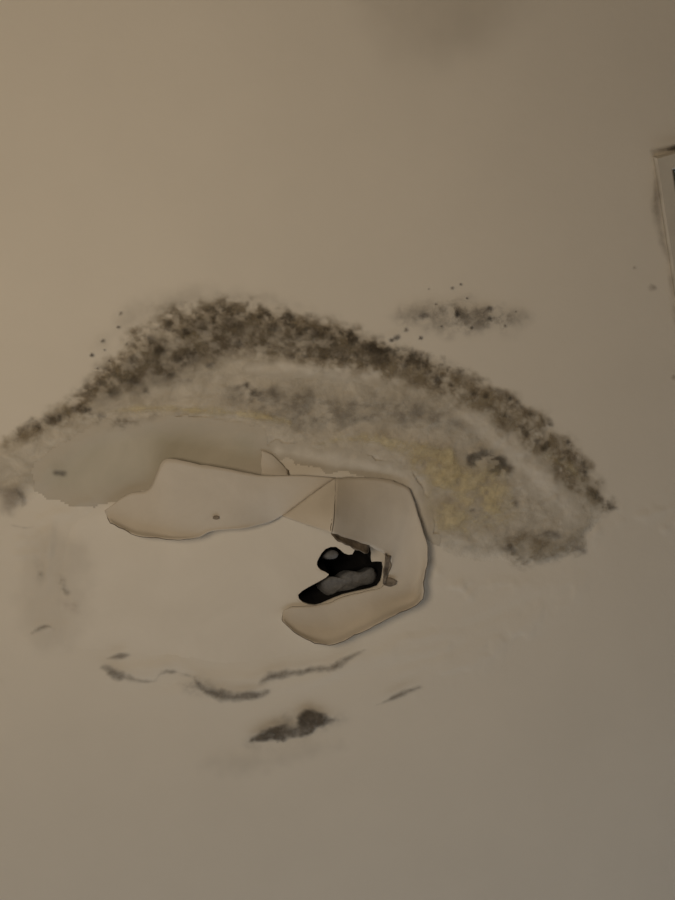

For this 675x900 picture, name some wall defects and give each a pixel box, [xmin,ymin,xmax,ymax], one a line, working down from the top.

water stain [51,347,172,420]
water stain [162,301,277,357]
water stain [285,314,460,389]
water stain [31,407,279,508]
spalling [0,305,608,663]
water stain [362,436,510,530]
water stain [462,383,585,489]
mould [251,710,330,741]